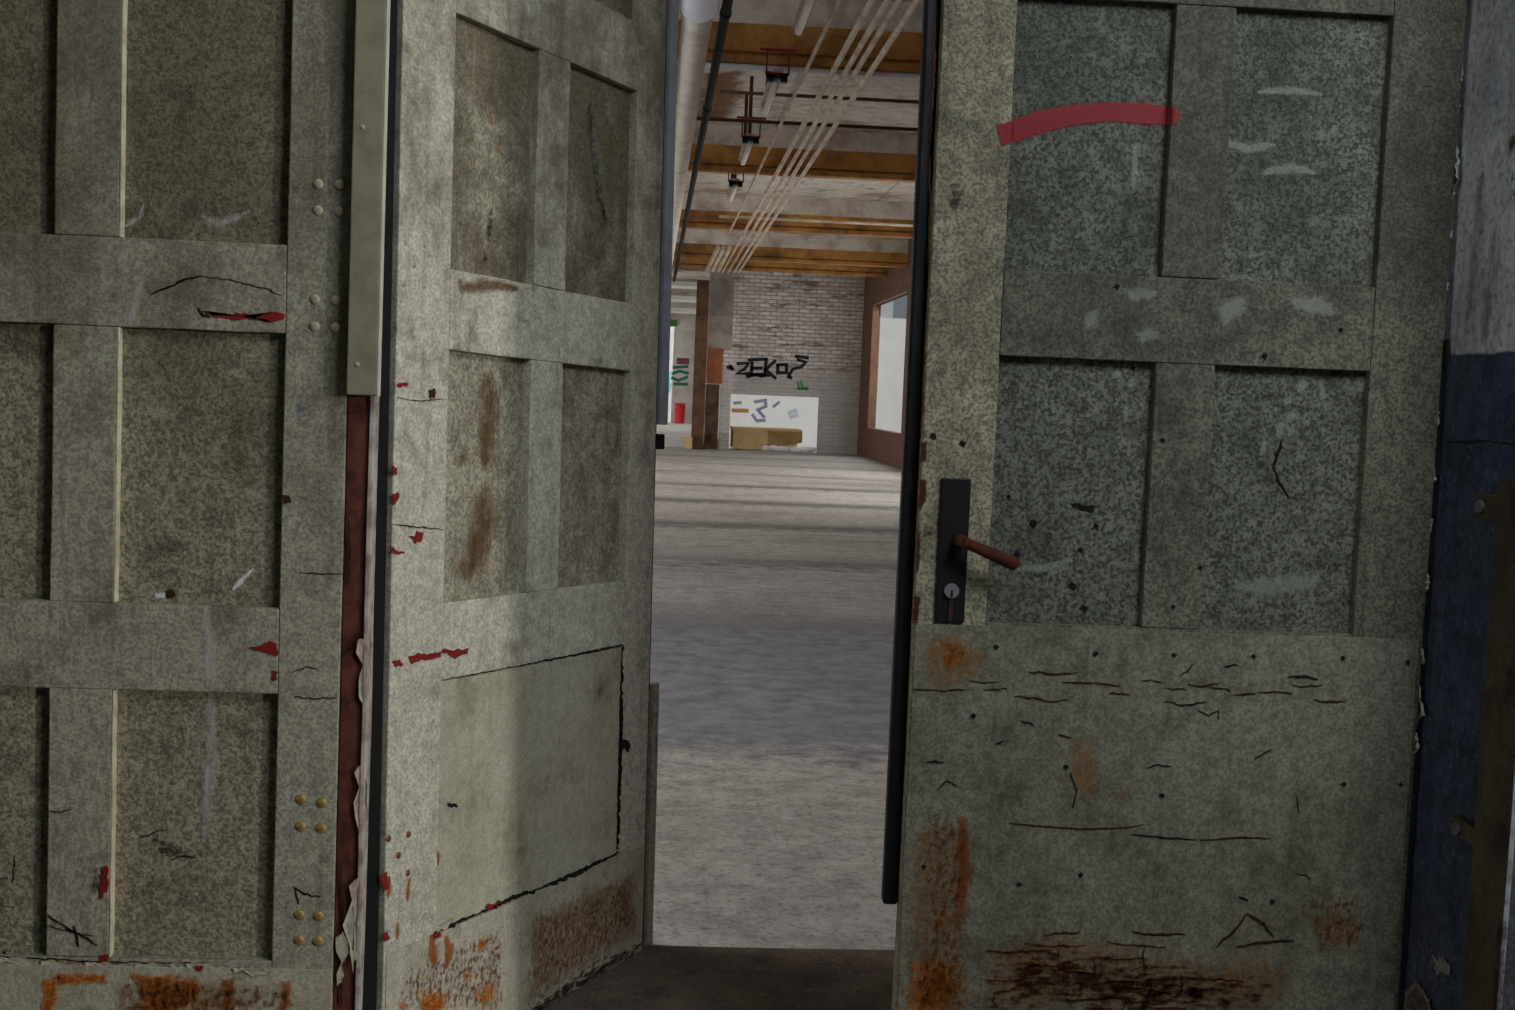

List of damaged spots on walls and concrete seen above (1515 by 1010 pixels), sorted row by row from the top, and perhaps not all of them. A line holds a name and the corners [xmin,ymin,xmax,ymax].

crack [150,276,280,296]
peeling [341,629,373,703]
peeling [354,766,368,830]
crack [48,915,97,947]
corrosion [42,972,292,1010]
peeling [336,868,361,1008]
corrosion [387,877,411,901]
corrosion [398,927,505,1010]
corrosion [903,805,1290,1010]